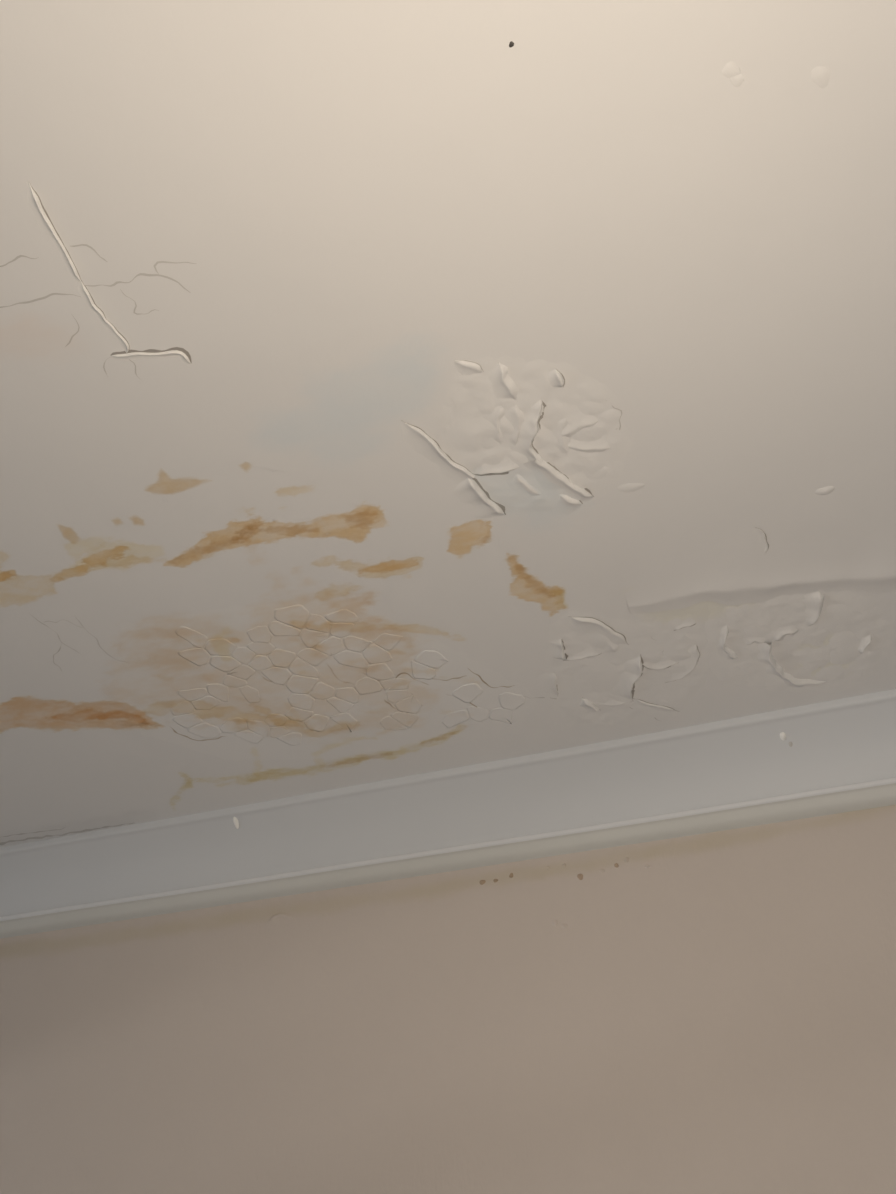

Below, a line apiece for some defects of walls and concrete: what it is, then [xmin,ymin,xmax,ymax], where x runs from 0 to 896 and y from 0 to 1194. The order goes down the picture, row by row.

crack [0,181,197,381]